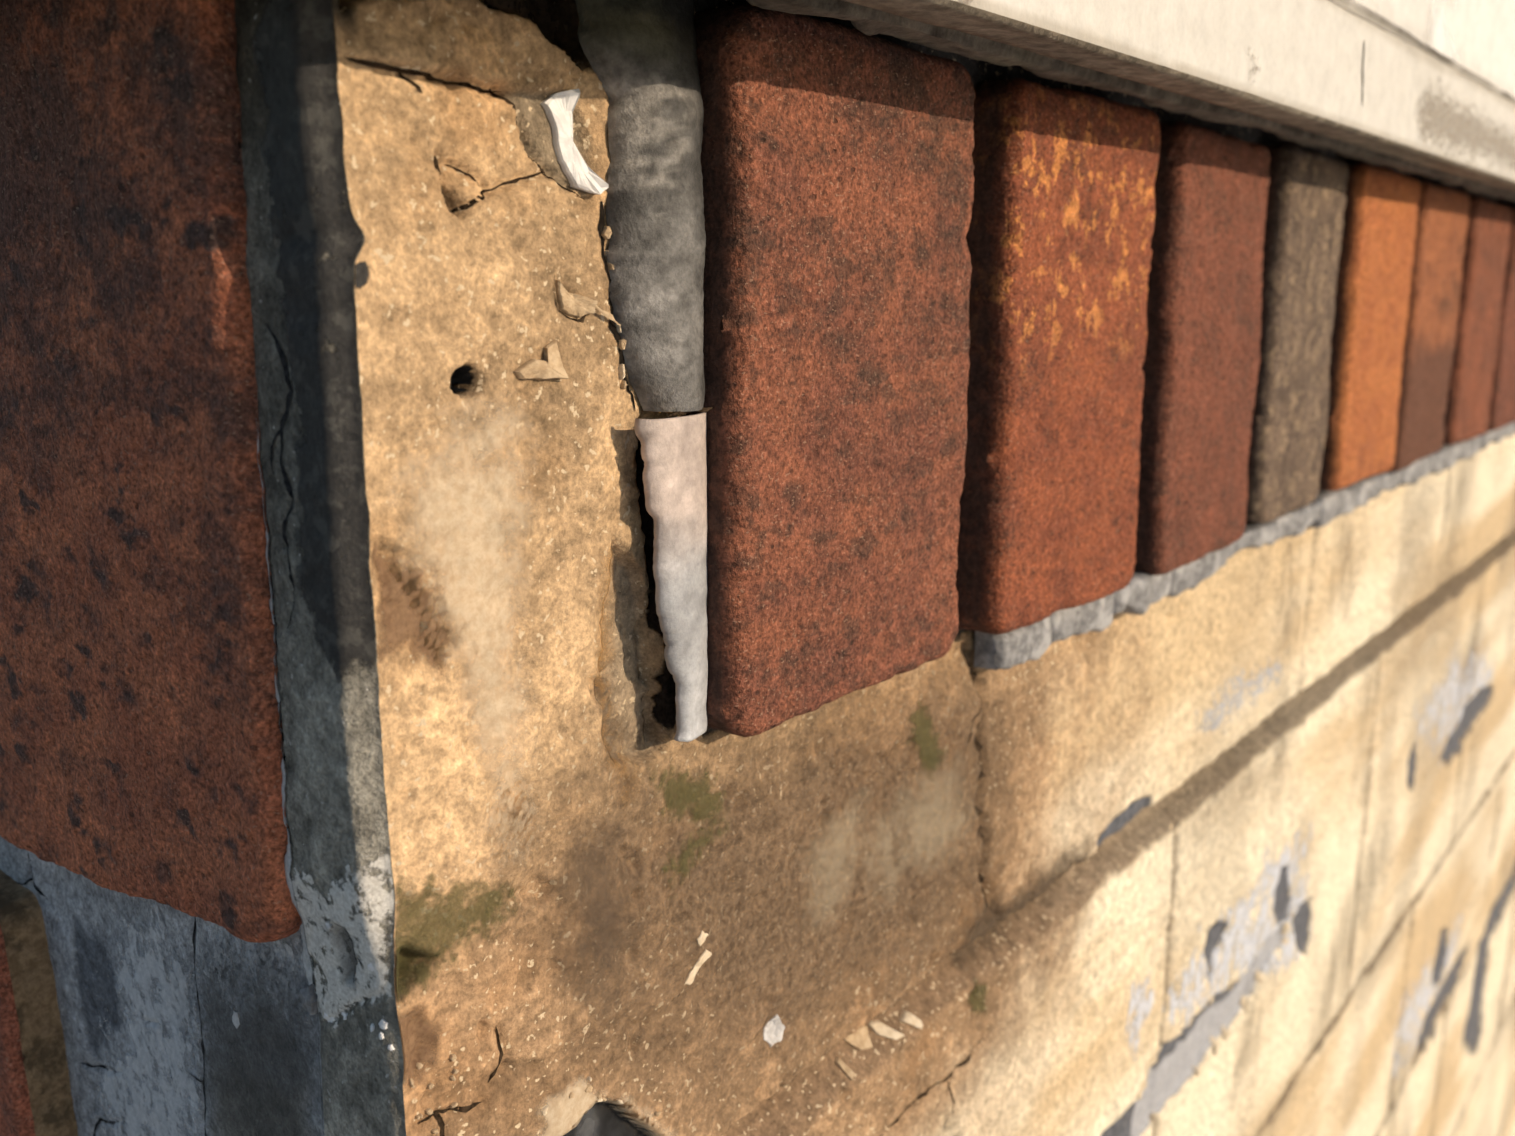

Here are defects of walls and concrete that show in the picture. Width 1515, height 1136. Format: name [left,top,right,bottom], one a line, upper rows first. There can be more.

crack [344,57,583,213]
crack [264,323,295,629]
peeling [480,0,713,742]
peeling [257,429,459,1089]
peeling [1407,638,1497,789]
crack [148,918,207,1136]
spalling [415,1101,458,1134]
crack [419,1027,503,1136]
spalling [541,1076,667,1136]
peeling [1100,821,1314,1136]
peeling [1391,866,1515,1082]